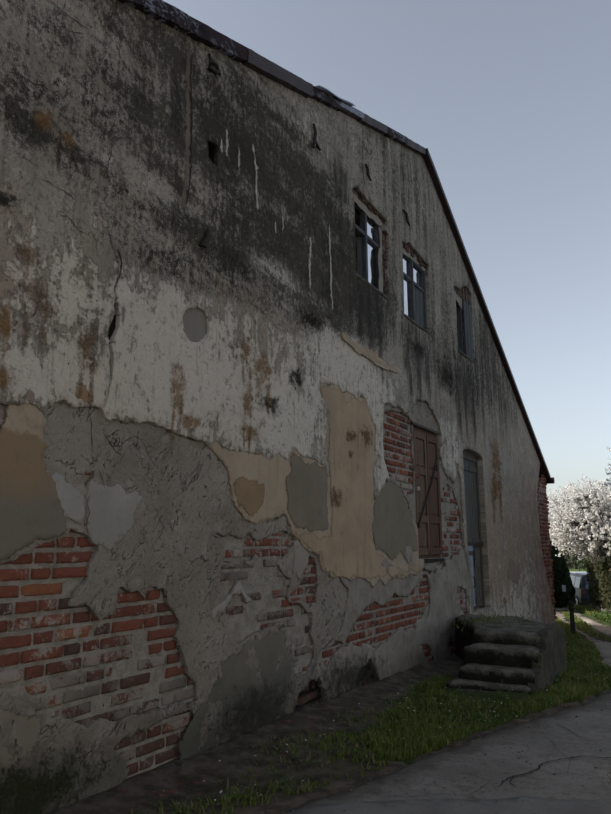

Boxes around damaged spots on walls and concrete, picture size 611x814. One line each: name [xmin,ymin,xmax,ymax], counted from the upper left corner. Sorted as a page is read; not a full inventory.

rust [78,329,96,405]
crack [108,314,116,366]
rust [171,365,201,440]
rust [240,341,272,450]
spalling [0,383,463,814]
crack [498,722,611,788]